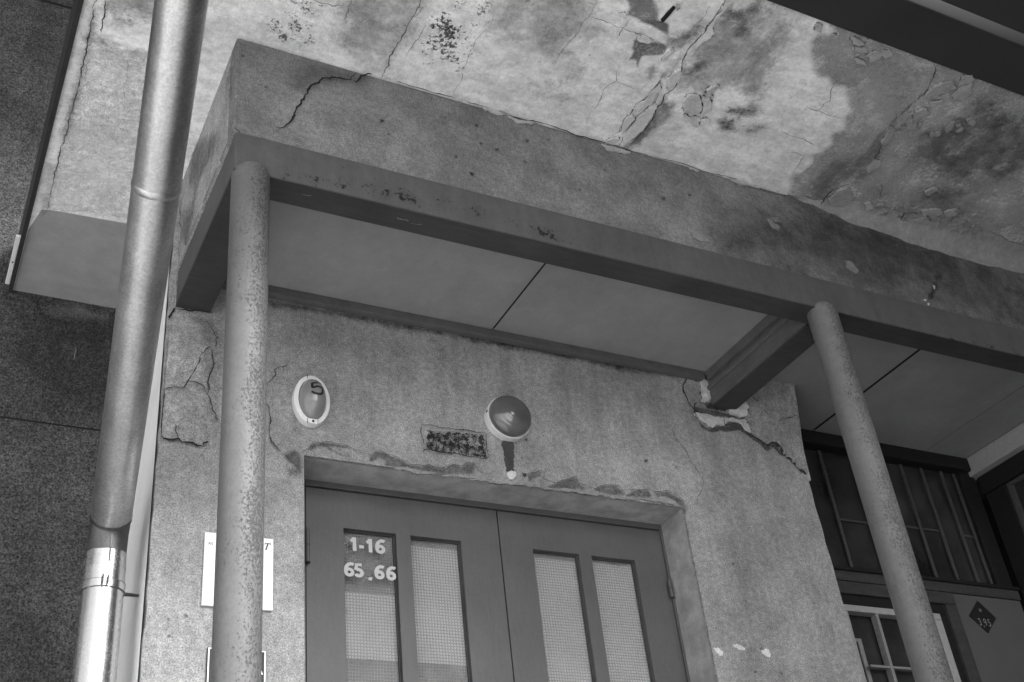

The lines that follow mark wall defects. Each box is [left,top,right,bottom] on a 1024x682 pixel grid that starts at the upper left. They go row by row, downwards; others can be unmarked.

crack [42,0,106,216]
damp [421,1,472,74]
crack [235,1,848,204]
flaking render [601,0,731,154]
crack [862,65,936,158]
peeling [793,22,1024,245]
crack [161,211,219,447]
flaking render [371,430,685,513]
flaking render [694,379,811,481]
crack [745,397,806,474]